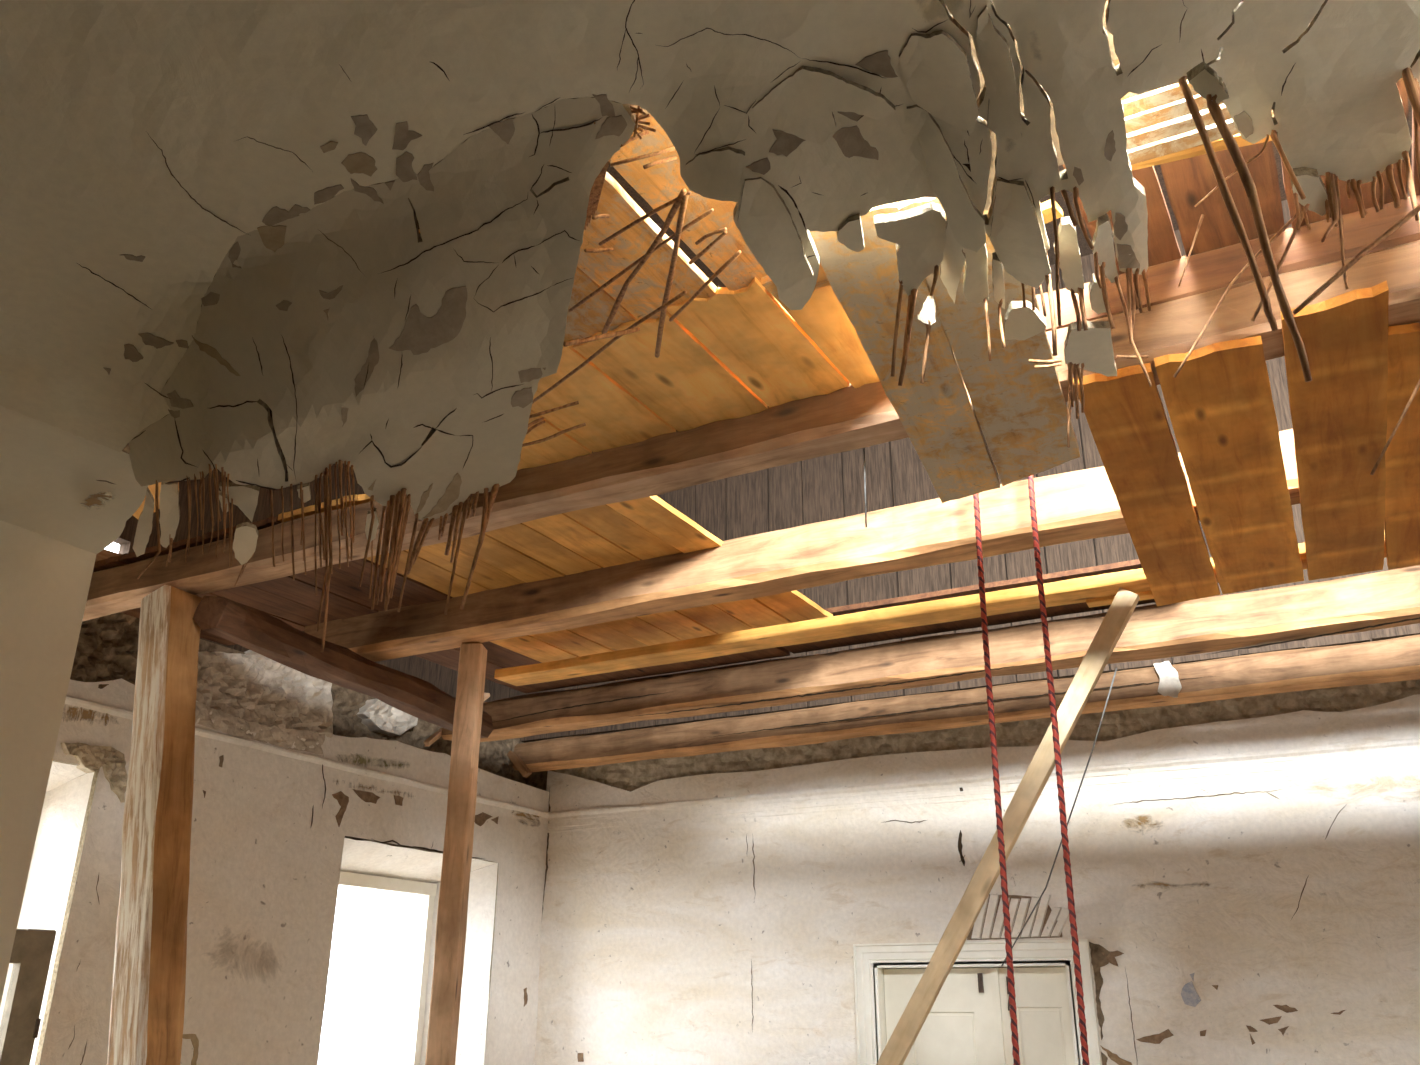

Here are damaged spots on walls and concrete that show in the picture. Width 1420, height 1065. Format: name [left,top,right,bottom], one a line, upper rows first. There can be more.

crack [617,0,902,155]
peeling [685,5,1051,292]
crack [912,0,1064,210]
crack [1103,0,1204,76]
crack [778,176,824,258]
crack [319,98,601,470]
flaking render [70,612,140,689]
flaking render [195,650,452,756]
flaking render [478,739,515,779]
flaking render [555,717,1052,792]
flaking render [1068,679,1420,741]
crack [1125,969,1138,1061]